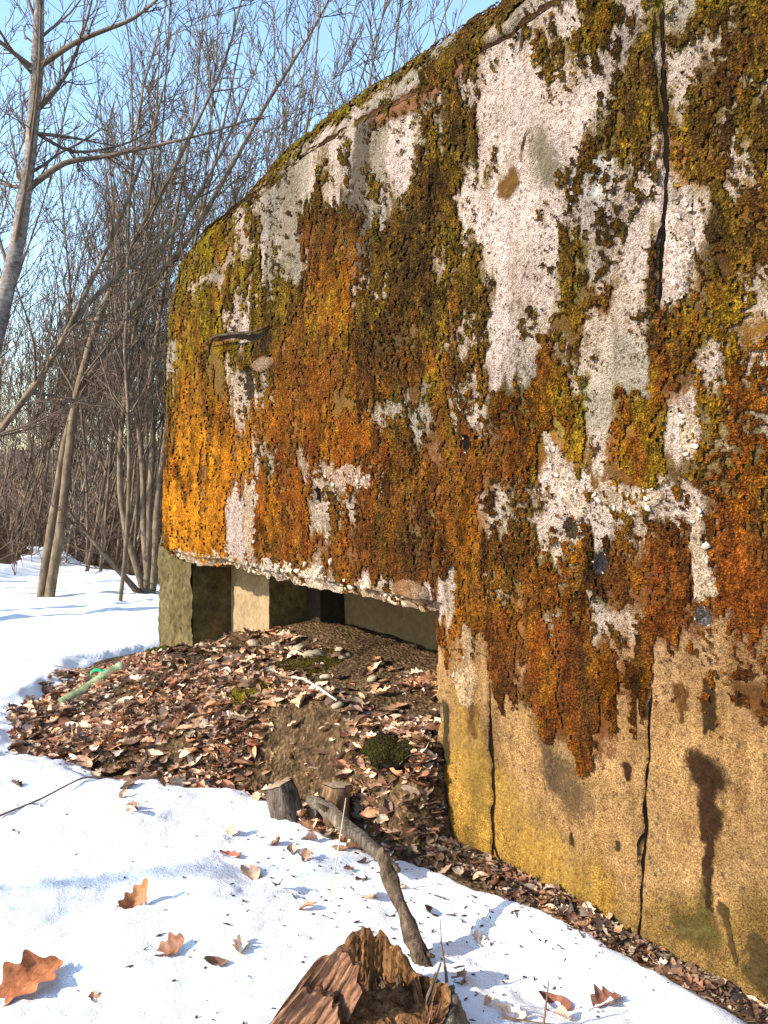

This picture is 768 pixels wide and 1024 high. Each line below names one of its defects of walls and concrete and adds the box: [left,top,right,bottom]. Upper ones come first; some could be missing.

crack [645,5,669,306]
crack [488,683,499,858]
crack [637,692,653,935]
water stain [683,748,768,1000]